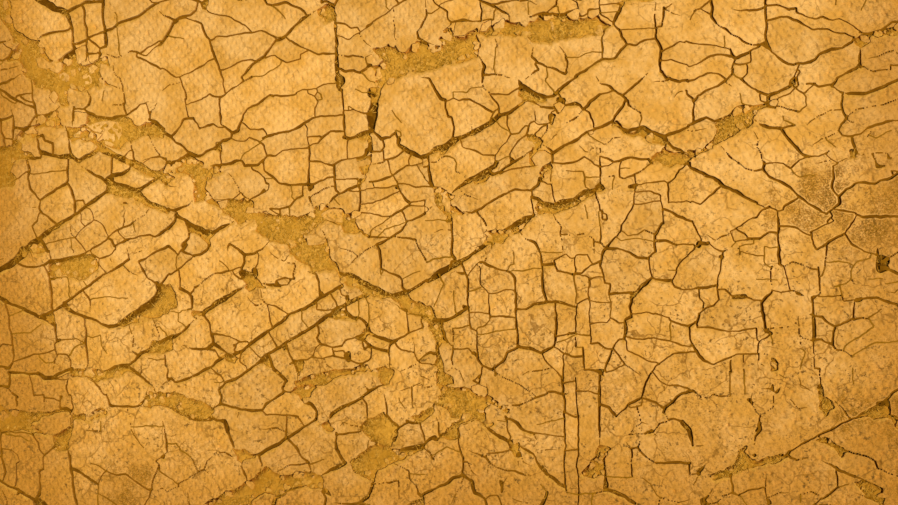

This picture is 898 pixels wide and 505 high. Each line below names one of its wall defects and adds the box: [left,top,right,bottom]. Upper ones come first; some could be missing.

crack [0,41,60,150]
crack [35,0,168,63]
spalling [370,9,610,103]
crack [416,0,581,45]
crack [759,116,806,156]
spalling [0,0,510,440]
crack [798,286,898,357]
crack [148,271,442,475]
spalling [0,405,107,451]
crack [66,379,233,505]
spalling [346,412,423,487]
crack [384,394,507,505]